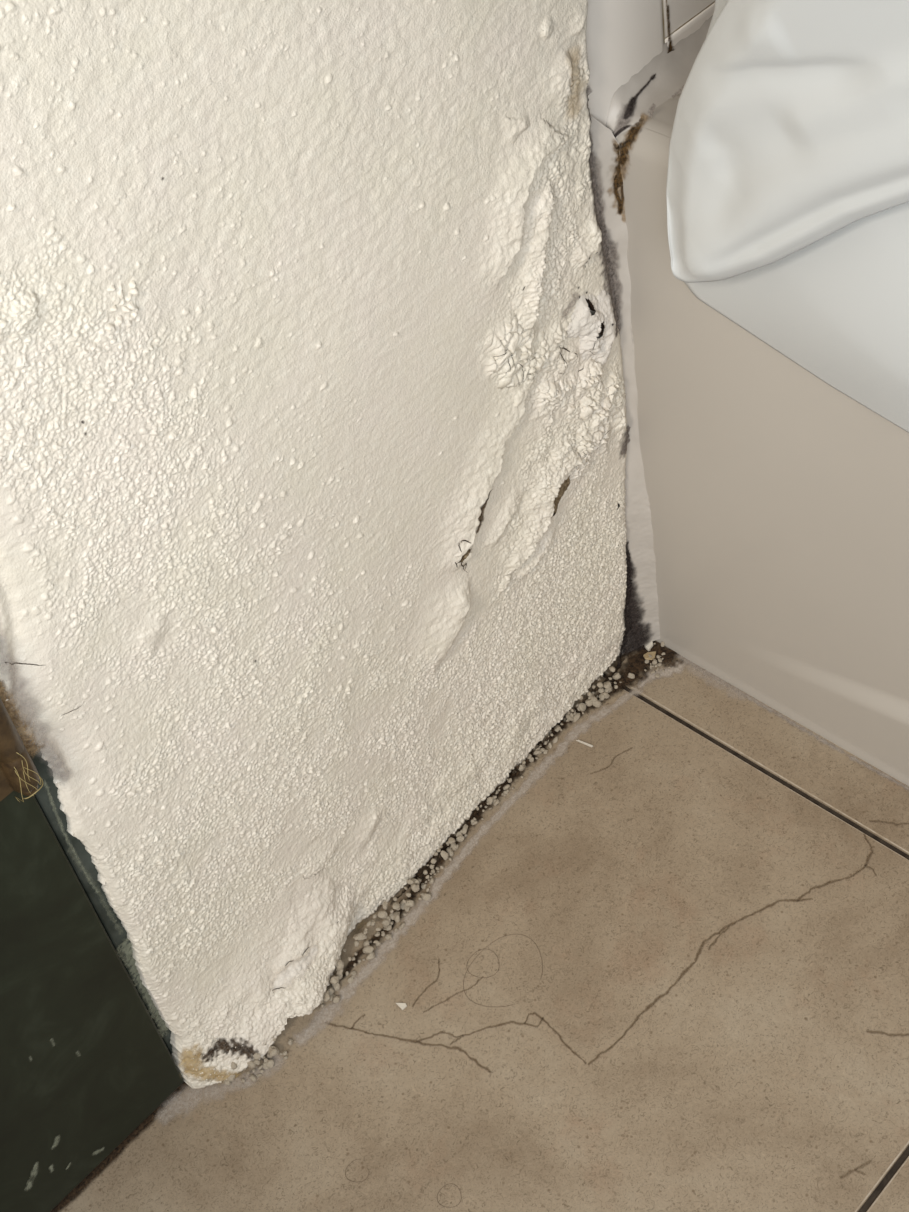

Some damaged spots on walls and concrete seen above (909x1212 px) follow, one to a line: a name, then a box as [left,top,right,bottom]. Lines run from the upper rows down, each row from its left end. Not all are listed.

corrosion [609,114,647,221]
peeling [435,309,626,593]
flaking render [207,1032,293,1086]
flaking render [320,642,671,1007]
crack [325,821,907,1073]